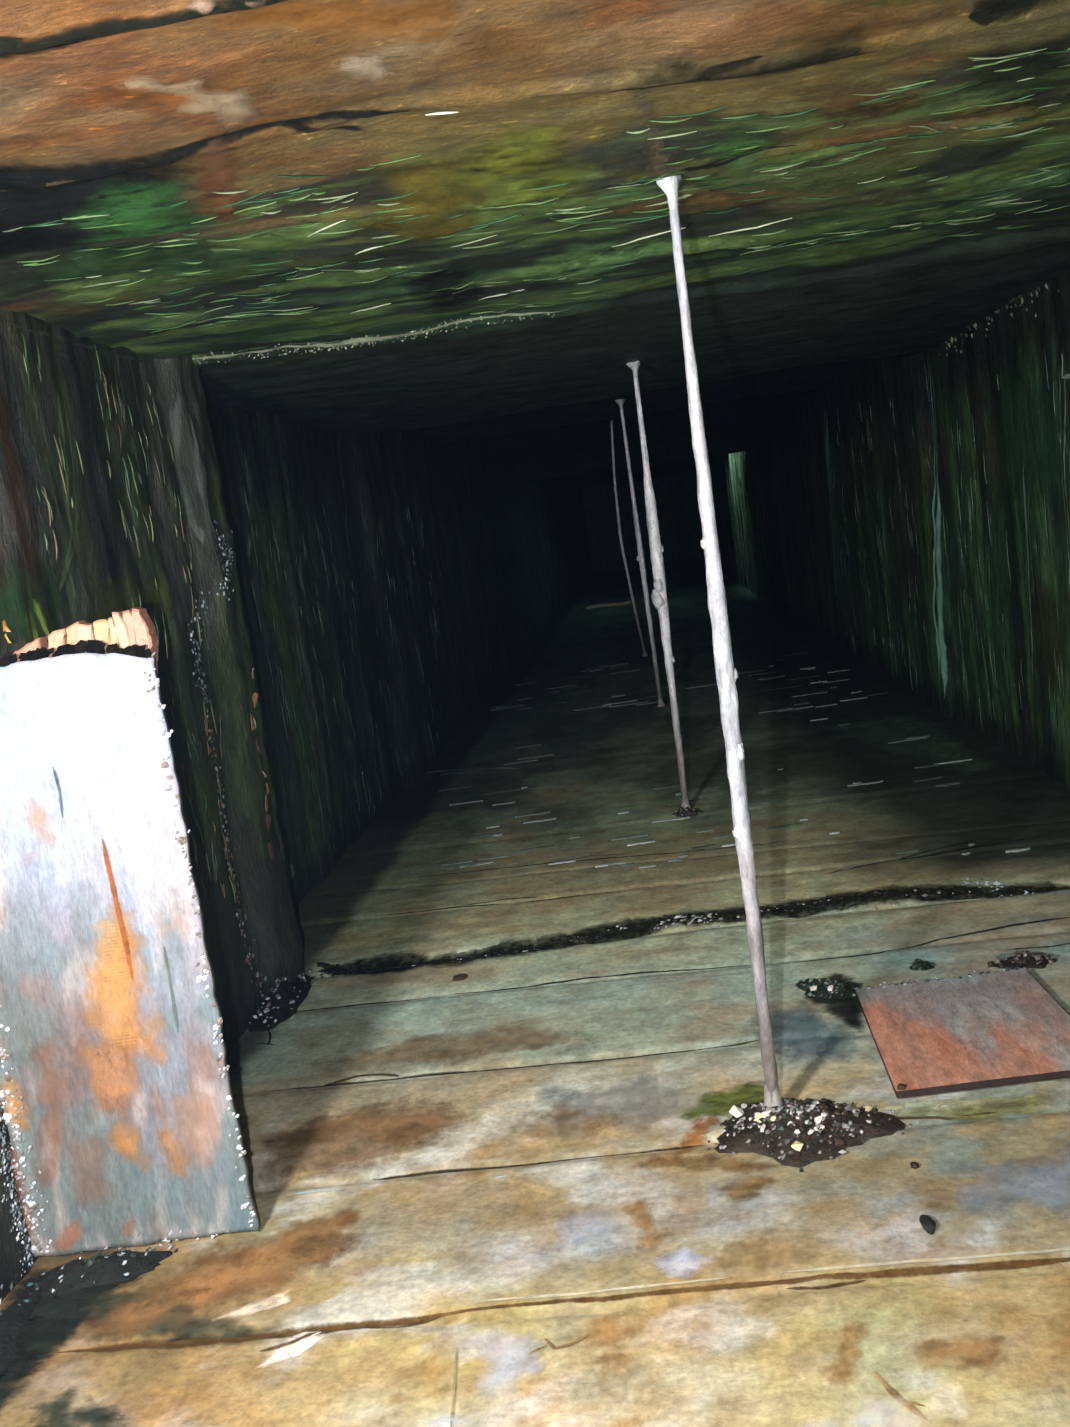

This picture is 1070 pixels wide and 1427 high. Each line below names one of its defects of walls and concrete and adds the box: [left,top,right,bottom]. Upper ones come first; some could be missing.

crack [0,0,287,58]
water stain [0,165,184,257]
crack [371,840,795,916]
rust [84,839,161,1110]
crack [801,917,1070,962]
crack [54,1248,1070,1353]